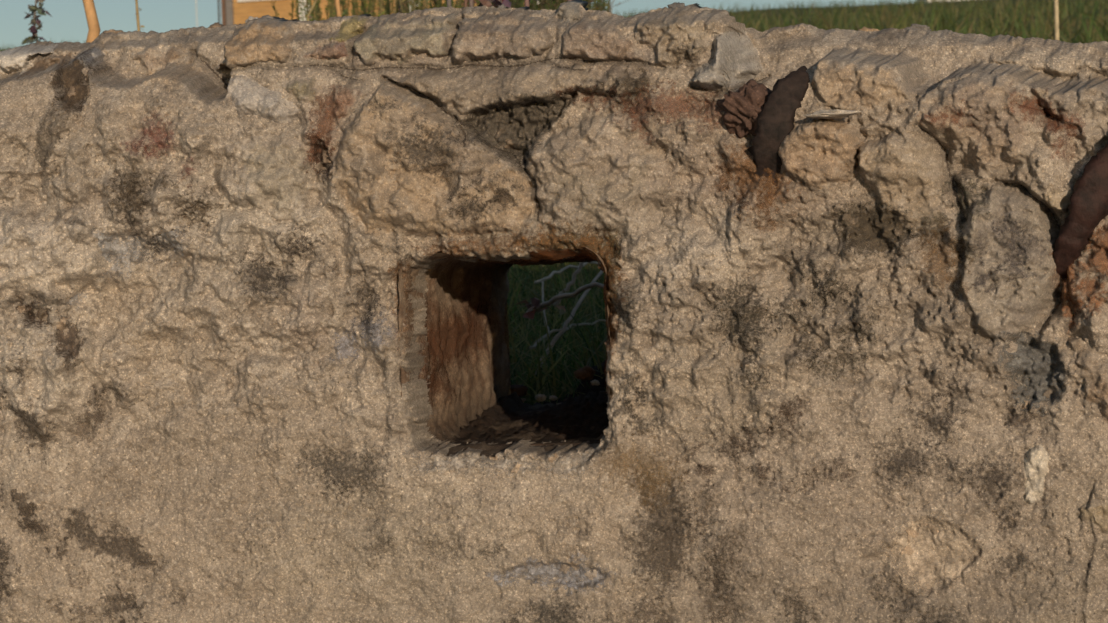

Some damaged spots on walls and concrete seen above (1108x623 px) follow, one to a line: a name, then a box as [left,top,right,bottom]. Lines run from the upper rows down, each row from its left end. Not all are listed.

rust [306,86,344,162]
crack [253,58,644,215]
rust [389,257,491,405]
rust [428,221,626,373]
leakage [501,395,854,623]
leakage [871,379,1021,531]
leakage [998,545,1042,586]
leakage [994,405,1049,433]